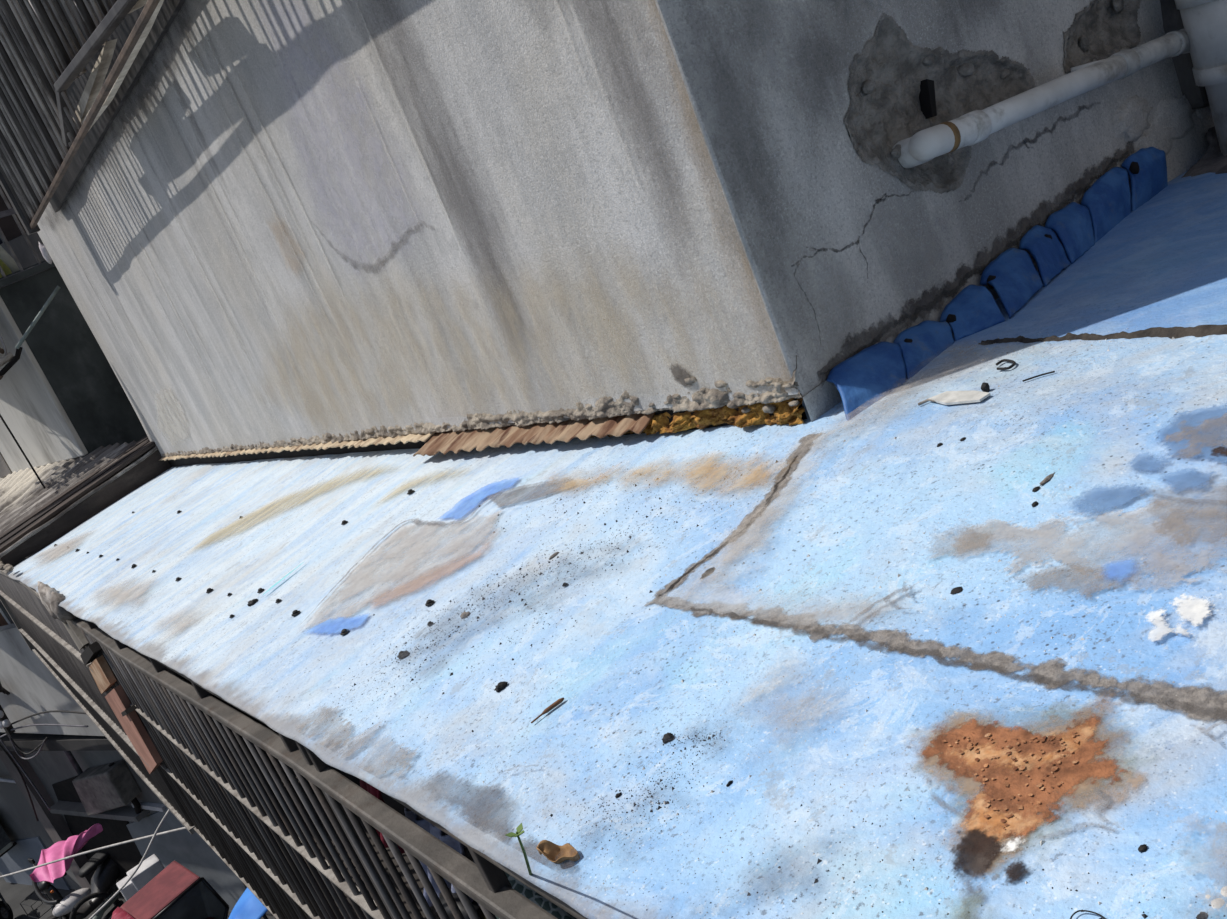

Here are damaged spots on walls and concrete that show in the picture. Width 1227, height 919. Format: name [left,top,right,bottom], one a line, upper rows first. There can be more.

spalling [1062,0,1141,74]
spalling [843,13,1036,194]
crack [959,105,1092,202]
crack [792,193,898,267]
leakage [1073,405,1227,513]
peeling [307,478,572,634]
corrosion [918,698,1143,918]